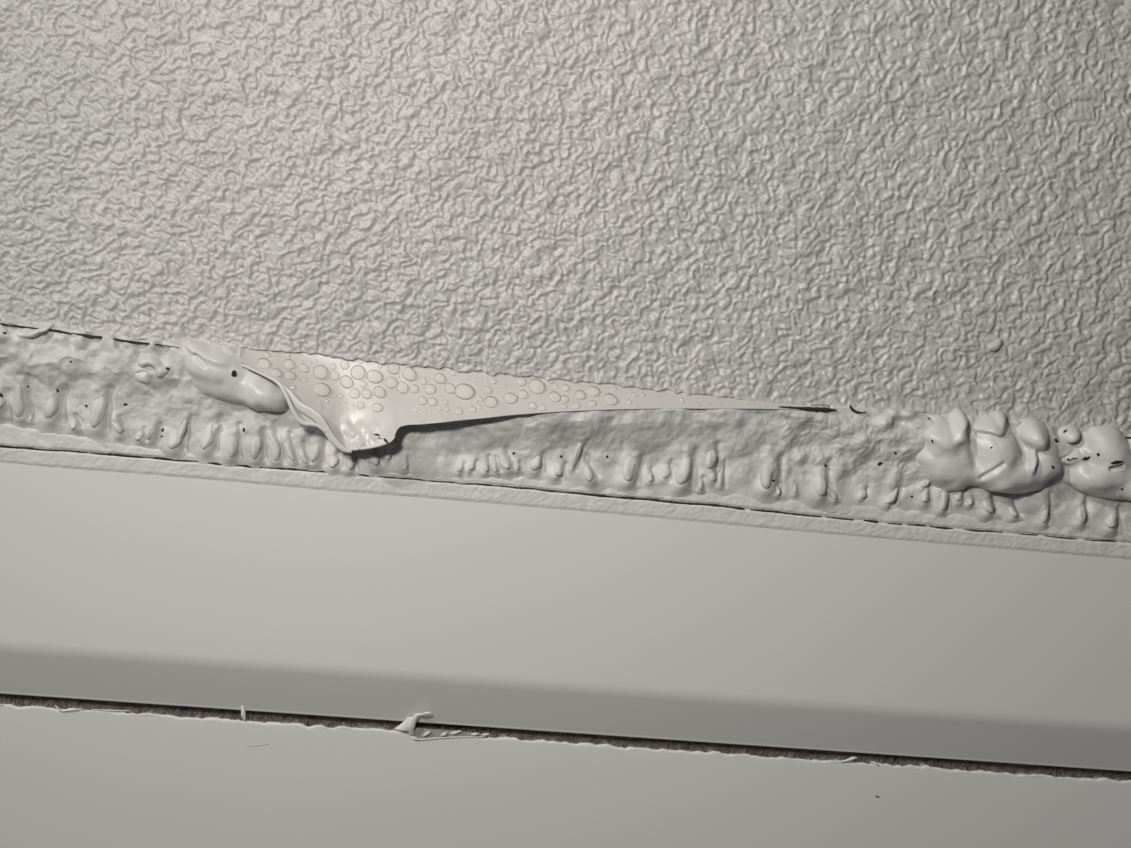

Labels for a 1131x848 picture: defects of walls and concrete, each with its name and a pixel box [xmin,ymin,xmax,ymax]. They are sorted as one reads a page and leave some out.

peeling [241,348,829,453]
peeling [394,712,494,740]